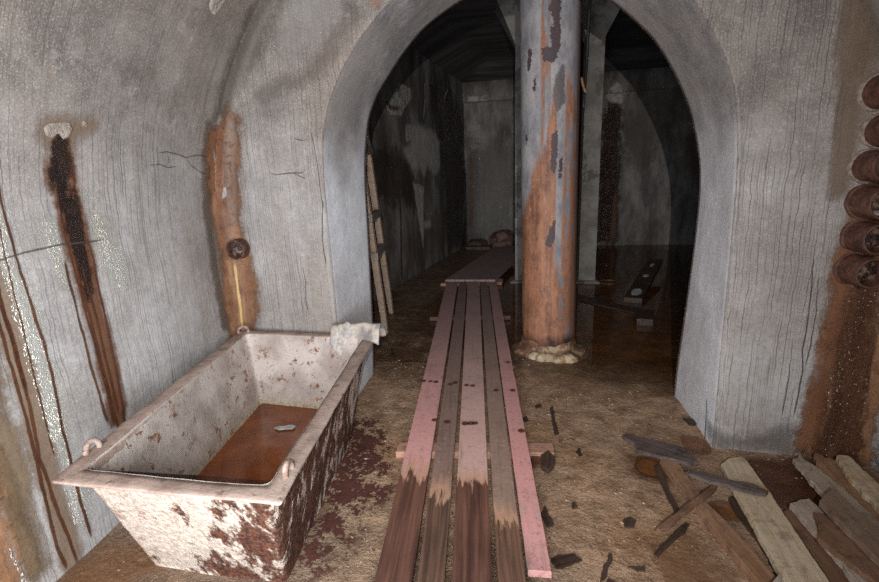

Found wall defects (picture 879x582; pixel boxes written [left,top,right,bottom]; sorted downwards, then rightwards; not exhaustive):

peeling [209,0,225,15]
corrosion [0,191,81,582]
corrosion [43,134,126,428]
corrosion [206,106,259,337]
water stain [373,80,478,249]
corrosion [746,275,879,514]
corrosion [75,486,91,536]